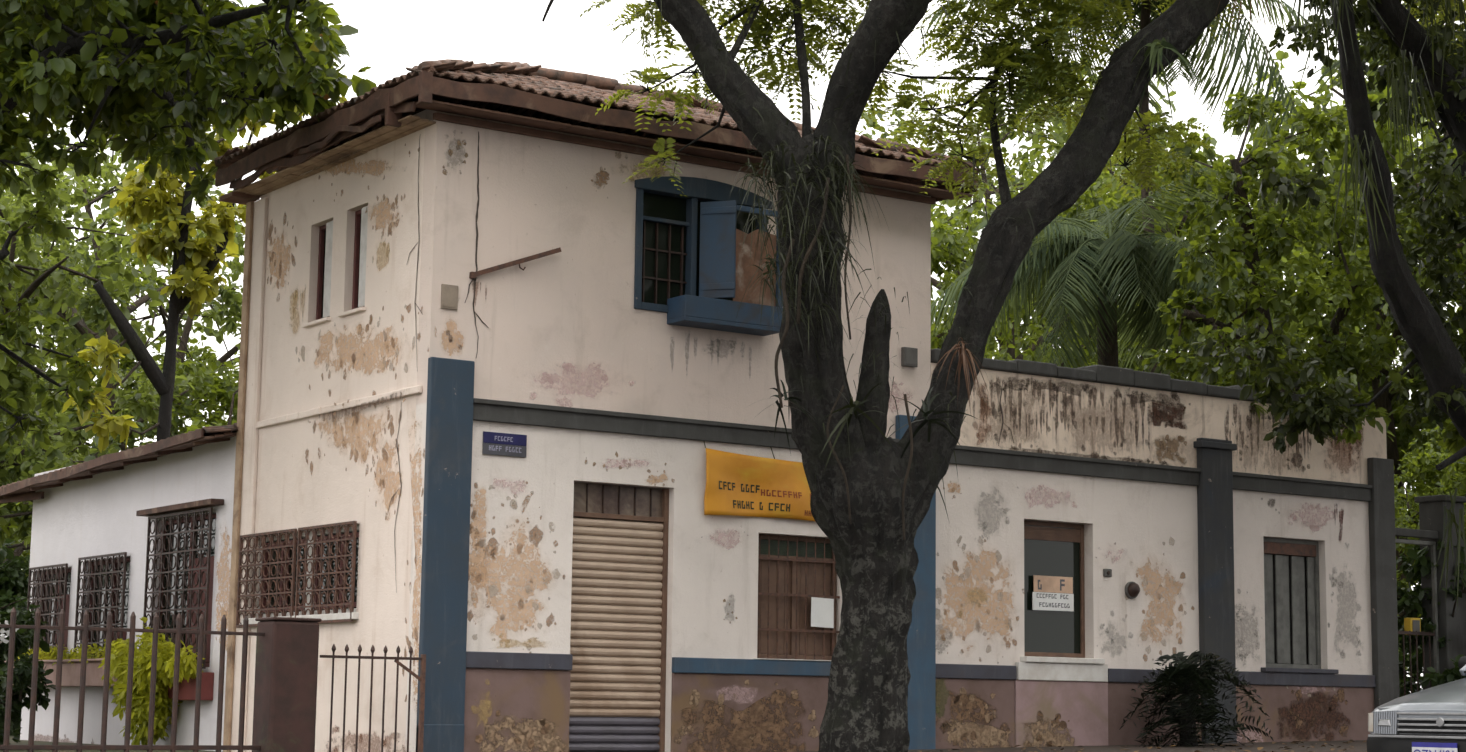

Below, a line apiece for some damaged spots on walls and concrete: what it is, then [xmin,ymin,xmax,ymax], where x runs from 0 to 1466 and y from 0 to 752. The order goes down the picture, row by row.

peeling [267,213,297,300]
crack [465,132,488,358]
damp [973,377,1191,467]
peeling [295,304,437,704]
peeling [467,482,565,653]
peeling [936,536,1025,661]
peeling [1125,558,1194,661]